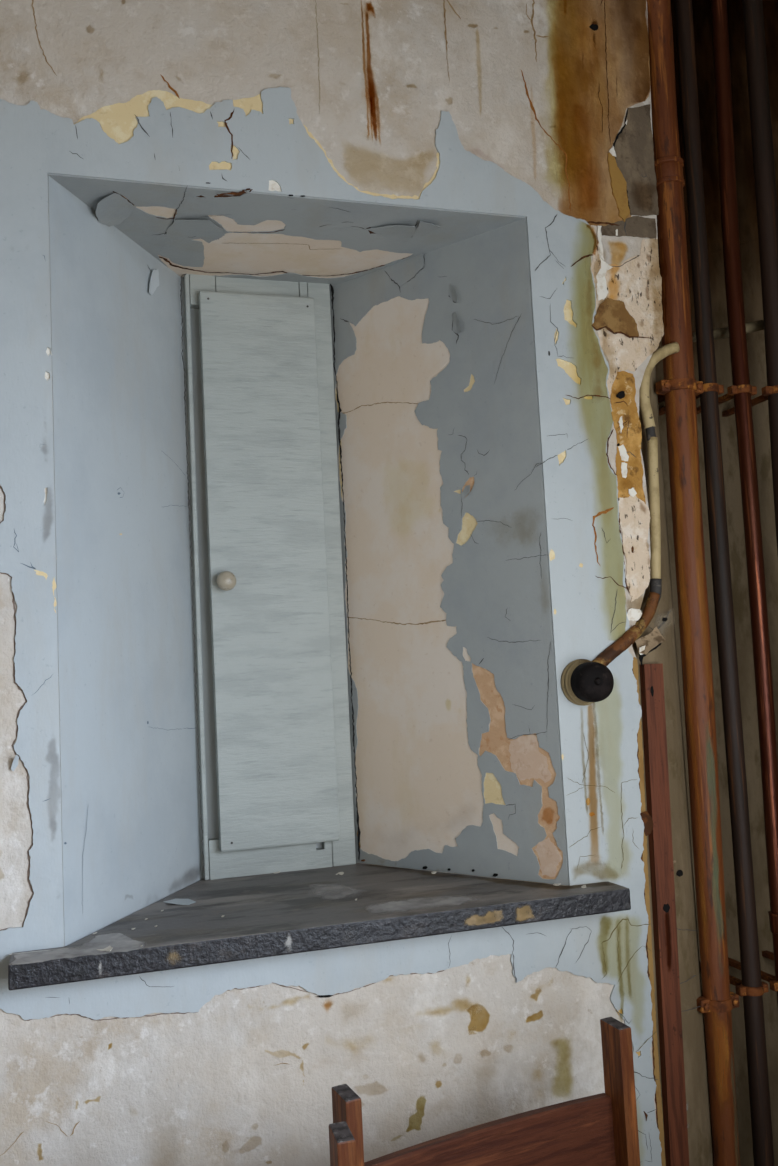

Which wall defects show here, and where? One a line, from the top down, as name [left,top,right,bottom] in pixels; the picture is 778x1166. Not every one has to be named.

corrosion [367,4,377,137]
crack [443,0,461,81]
crack [521,0,592,358]
crack [385,258,520,384]
crack [514,430,616,491]
corrosion [672,406,692,682]
peeling [0,87,664,1166]
crack [479,607,551,740]
crack [566,737,640,868]
crack [502,919,650,983]
crack [615,1010,658,1162]